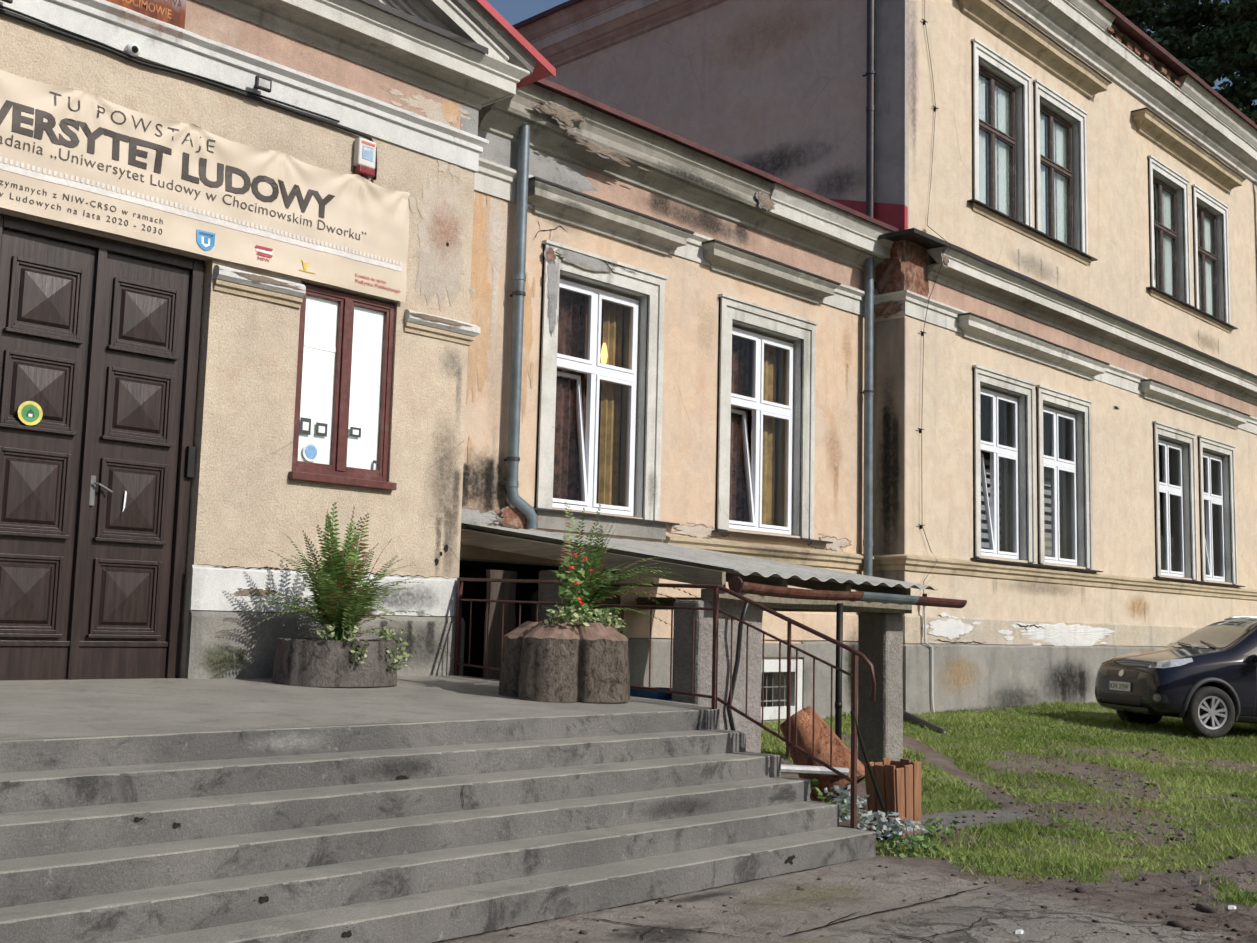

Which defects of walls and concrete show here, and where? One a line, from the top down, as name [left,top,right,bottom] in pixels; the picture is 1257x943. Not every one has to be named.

flaking render [874,229,949,318]
leakage [462,428,513,511]
leakage [881,411,899,522]
peeling [921,612,981,641]
peeling [998,622,1115,646]
crack [432,858,1066,943]